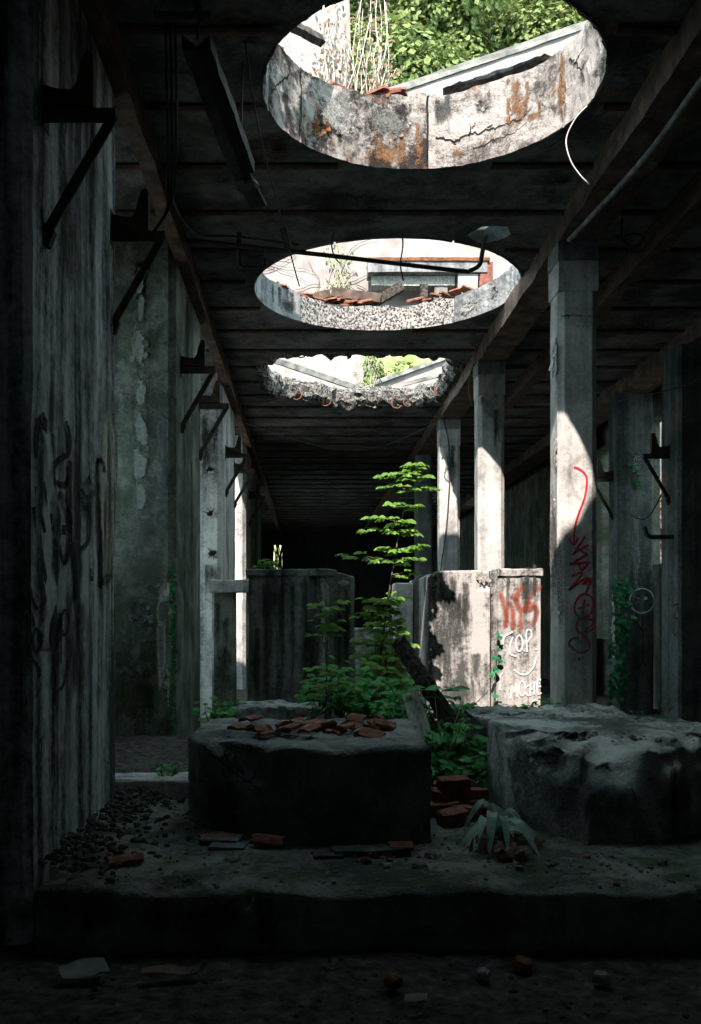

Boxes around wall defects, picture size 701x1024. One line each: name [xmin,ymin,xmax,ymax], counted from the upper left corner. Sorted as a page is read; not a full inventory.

corrosion [367,123,423,163]
crack [426,95,531,165]
corrosion [506,81,541,126]
corrosion [557,52,566,112]
peeling [130,267,149,511]
spalling [255,352,464,411]
damp [432,570,485,703]